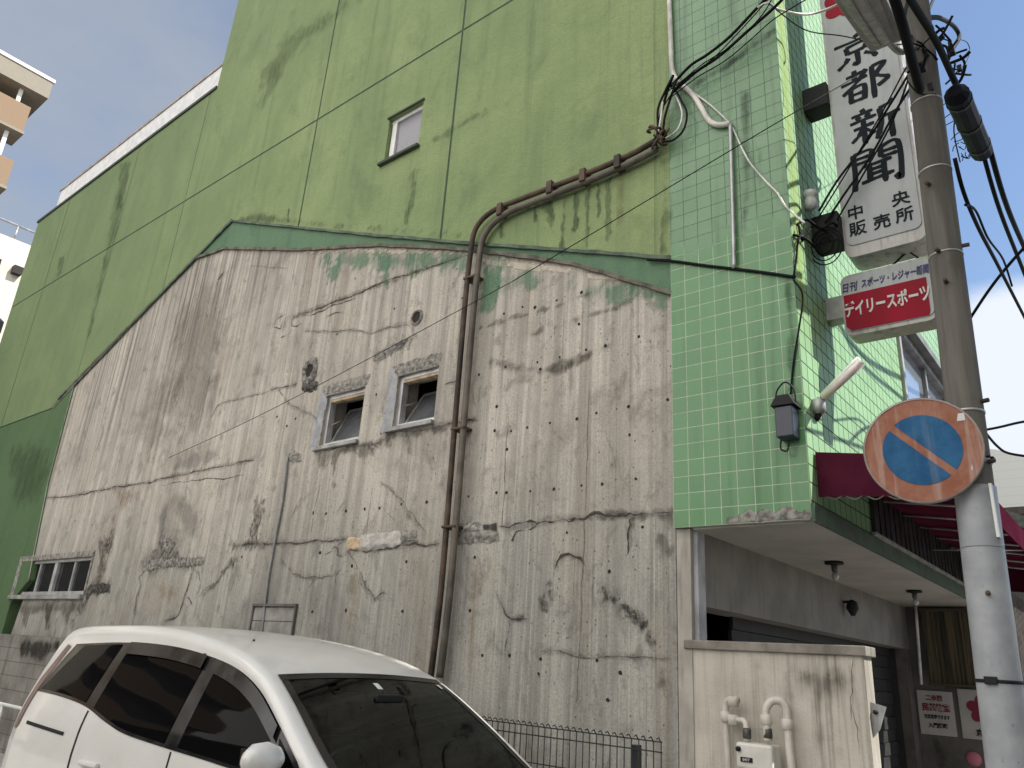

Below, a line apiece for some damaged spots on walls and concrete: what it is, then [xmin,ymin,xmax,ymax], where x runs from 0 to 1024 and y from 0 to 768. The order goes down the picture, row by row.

peeling [304,247,463,256]
peeling [482,257,571,274]
spalling [301,357,327,449]
crack [49,459,254,498]
crack [499,401,669,554]
crack [166,485,438,621]
peeling [346,530,418,551]
spalling [458,522,500,546]
spalling [725,506,812,524]
crack [548,547,657,701]